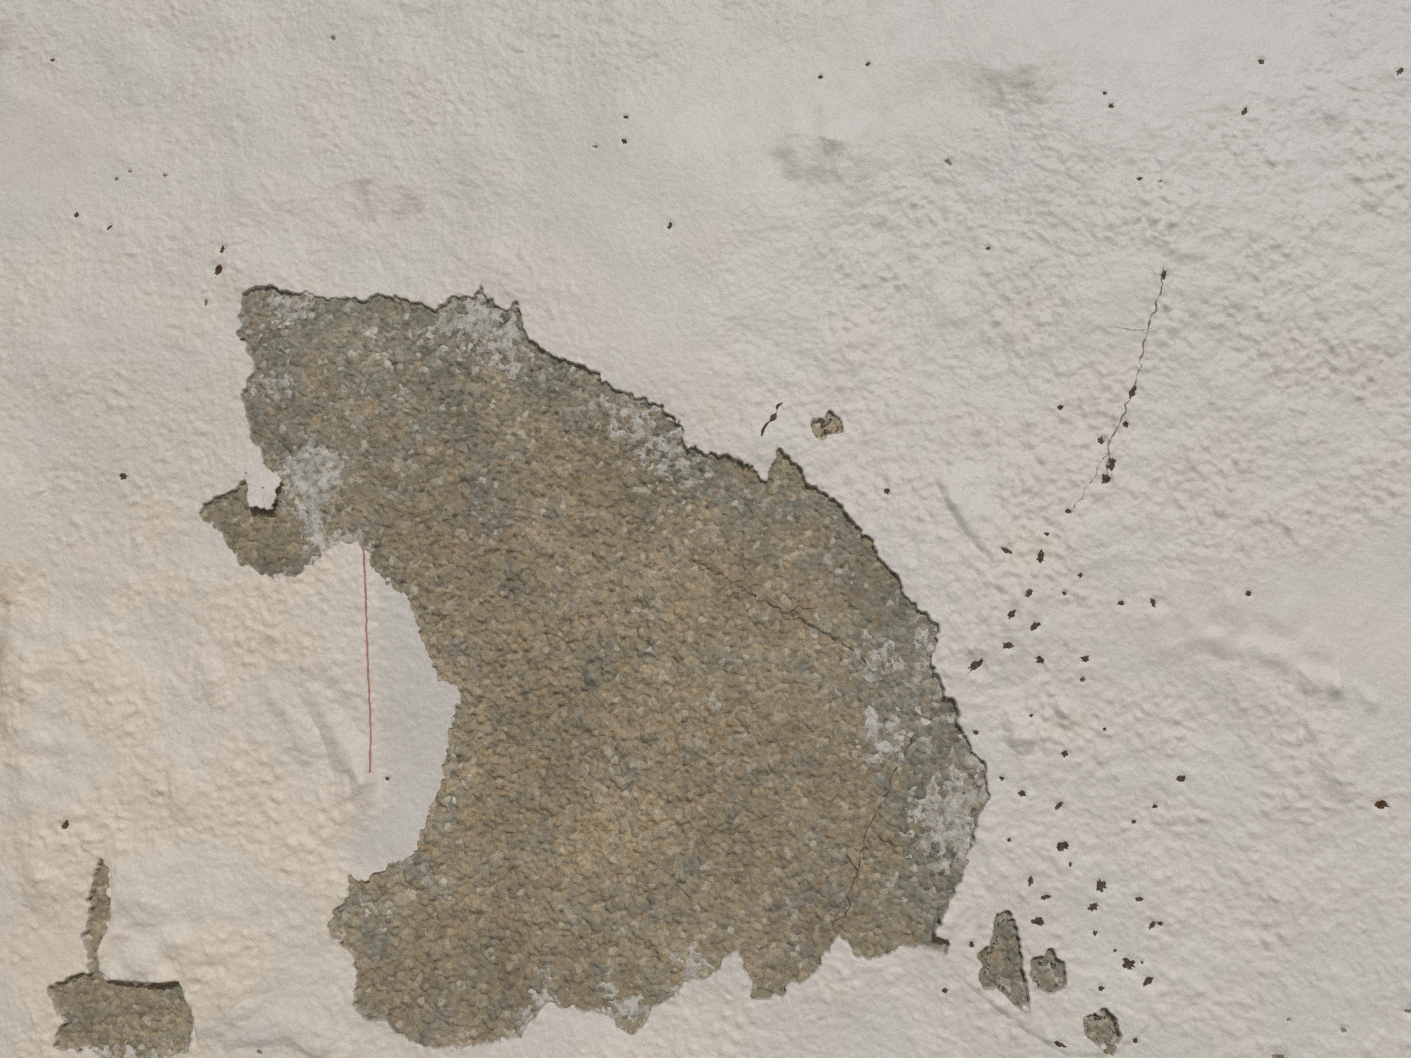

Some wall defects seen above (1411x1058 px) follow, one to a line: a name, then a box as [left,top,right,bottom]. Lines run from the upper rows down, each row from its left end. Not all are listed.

crack [1067,267,1167,514]
peeling [201,287,990,1047]
peeling [52,834,314,1058]
peeling [977,910,1064,1005]
peeling [1083,1008,1118,1054]